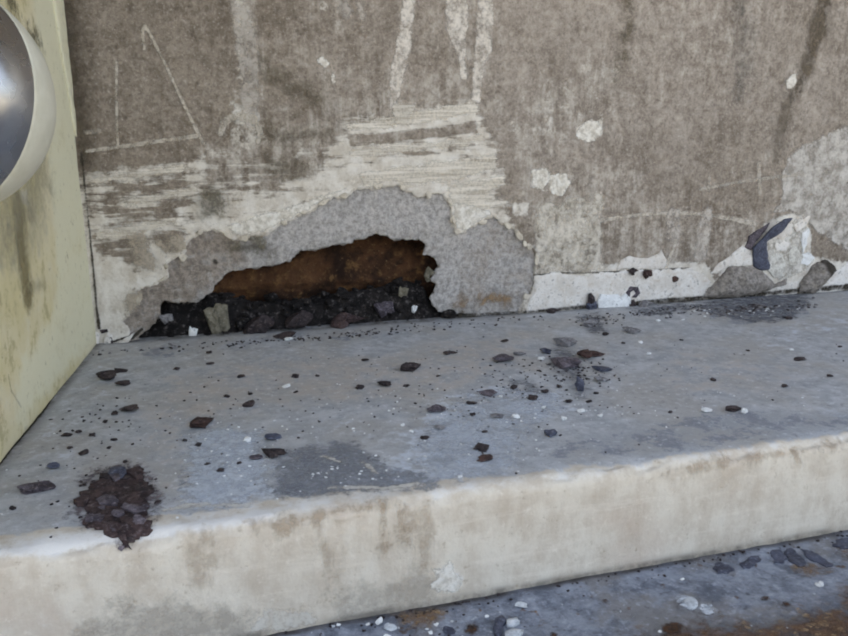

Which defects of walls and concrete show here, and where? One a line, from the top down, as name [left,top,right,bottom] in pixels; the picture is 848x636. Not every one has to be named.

peeling [344,101,480,133]
peeling [350,133,485,156]
spalling [89,155,814,344]
peeling [817,262,848,292]
rust [703,586,848,636]
rust [662,622,690,636]